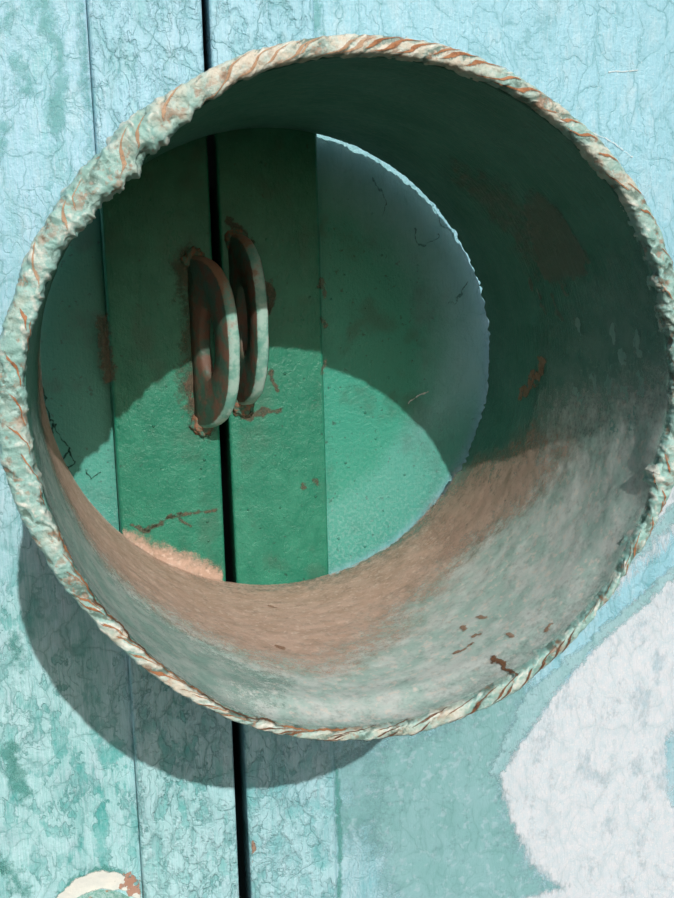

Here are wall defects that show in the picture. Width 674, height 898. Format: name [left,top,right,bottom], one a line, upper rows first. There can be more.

corrosion [202,36,540,106]
corrosion [119,115,145,173]
corrosion [541,107,597,139]
corrosion [265,281,276,314]
corrosion [96,314,117,383]
corrosion [9,395,45,505]
crack [43,388,101,479]
corrosion [39,369,567,673]
corrosion [620,471,666,583]
corrosion [57,526,574,741]
peeling [56,865,141,898]